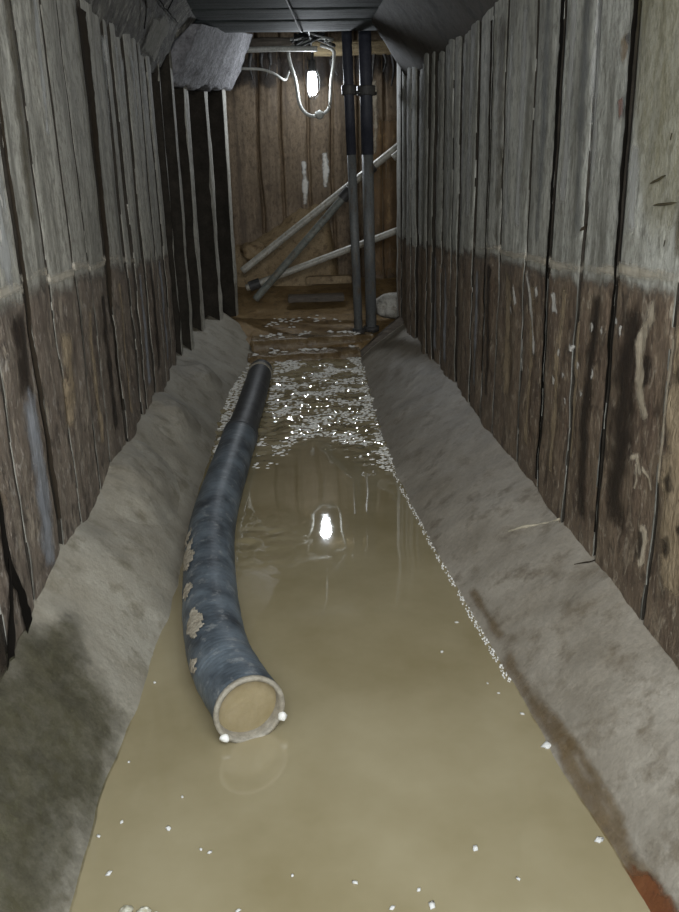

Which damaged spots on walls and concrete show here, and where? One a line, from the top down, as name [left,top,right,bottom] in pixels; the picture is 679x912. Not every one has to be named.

crack [0,96,61,520]
damp [397,0,679,669]
crack [0,495,32,671]
damp [0,255,177,912]
rust [626,866,676,912]